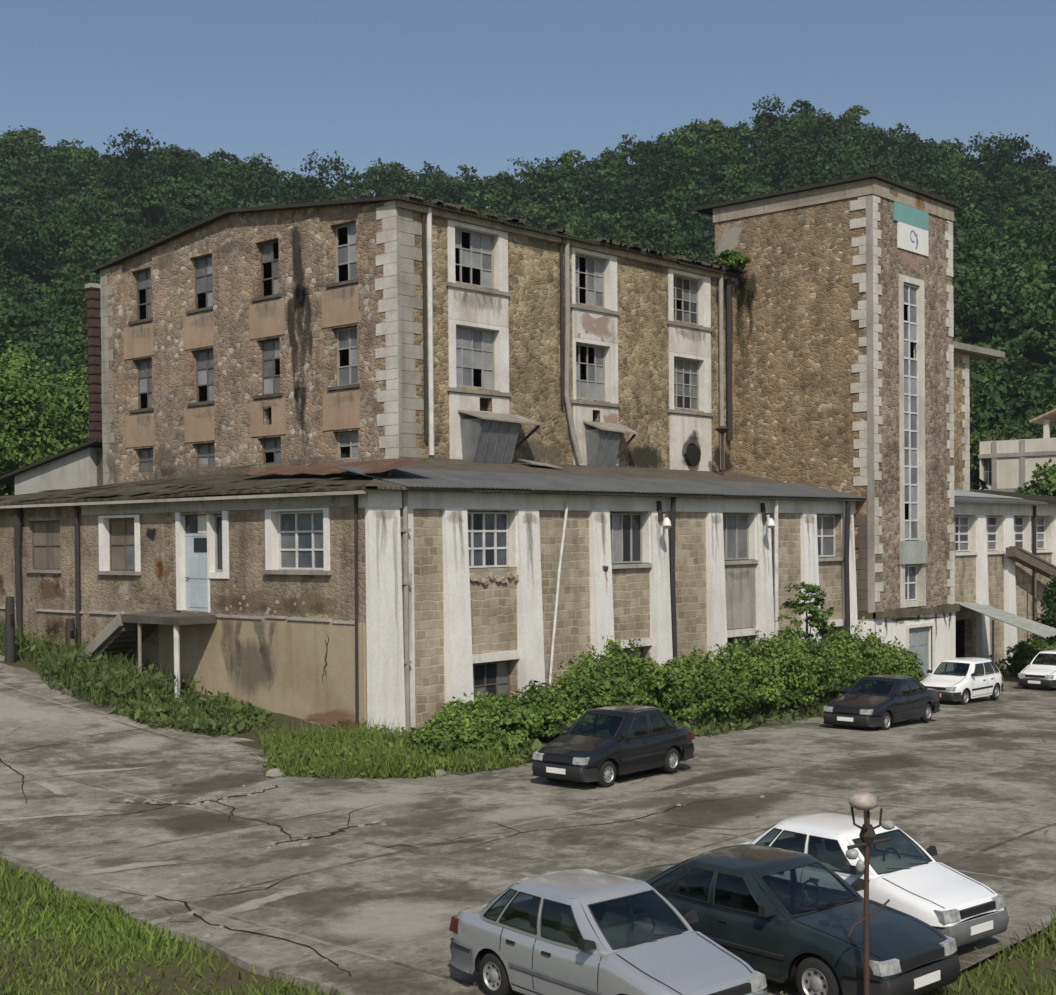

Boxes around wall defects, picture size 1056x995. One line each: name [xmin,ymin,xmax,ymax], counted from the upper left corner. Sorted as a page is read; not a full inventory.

damp [287,227,312,443]
peeling [577,313,612,341]
rust [155,559,169,577]
damp [224,623,274,689]
crack [0,740,112,804]
crack [93,785,390,851]
crack [97,872,351,976]